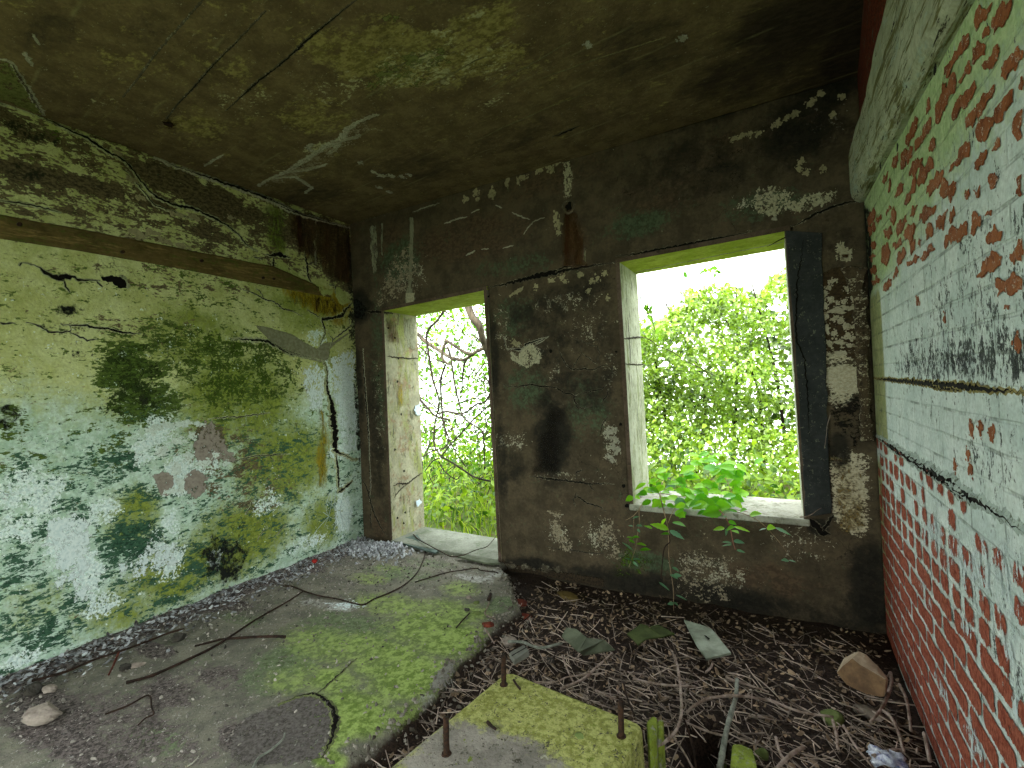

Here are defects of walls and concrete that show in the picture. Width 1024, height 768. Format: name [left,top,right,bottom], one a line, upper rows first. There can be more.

damp [257,113,379,194]
damp [563,161,574,198]
peeling [753,186,837,217]
peeling [864,0,1024,310]
crack [0,102,422,542]
crack [790,200,857,436]
peeling [823,241,867,359]
damp [301,349,358,453]
crack [873,376,1024,396]
crack [876,433,1024,537]
peeling [953,418,995,480]
peeling [876,438,1024,768]